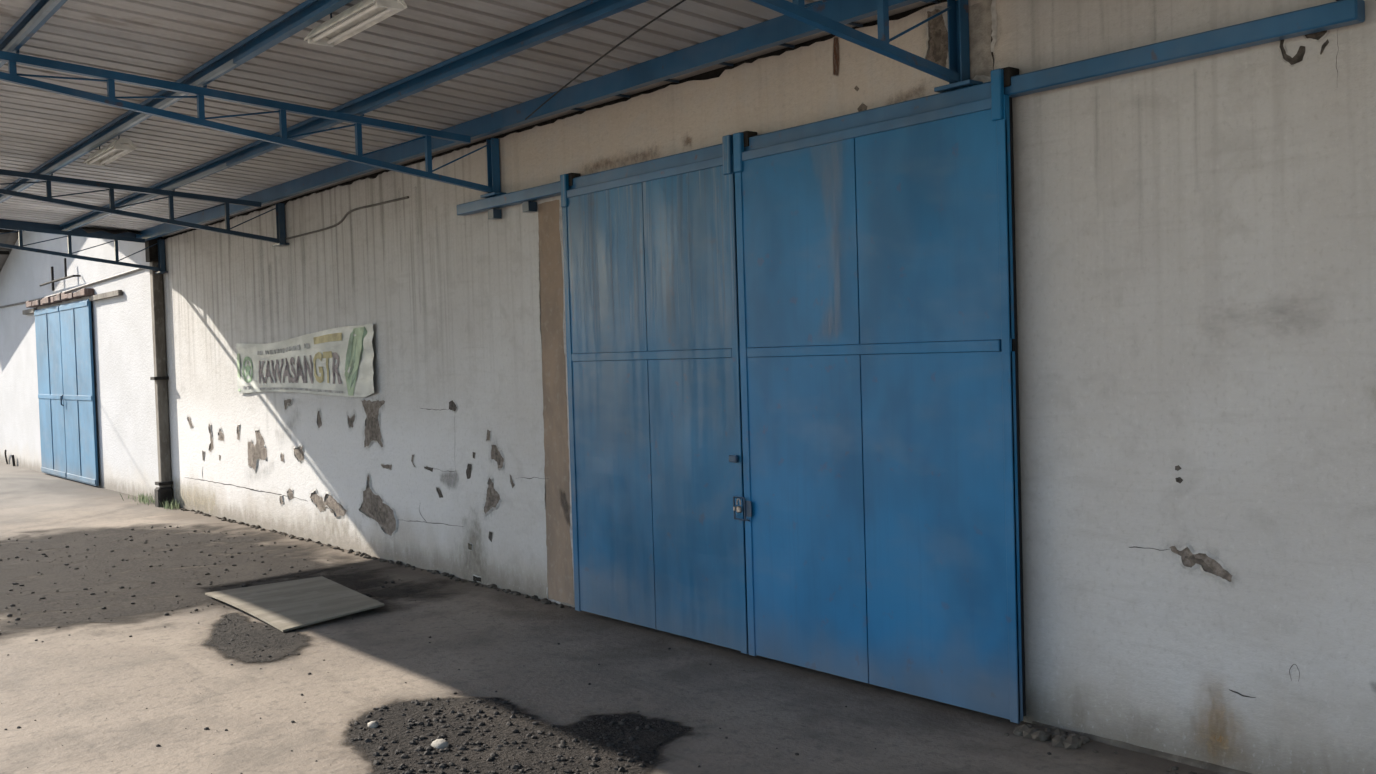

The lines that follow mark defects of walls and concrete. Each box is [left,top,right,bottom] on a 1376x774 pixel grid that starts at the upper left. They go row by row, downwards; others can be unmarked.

spalling [187,416,304,473]
spalling [279,398,398,537]
spalling [411,454,443,498]
spalling [466,429,515,551]
spalling [1169,542,1233,584]